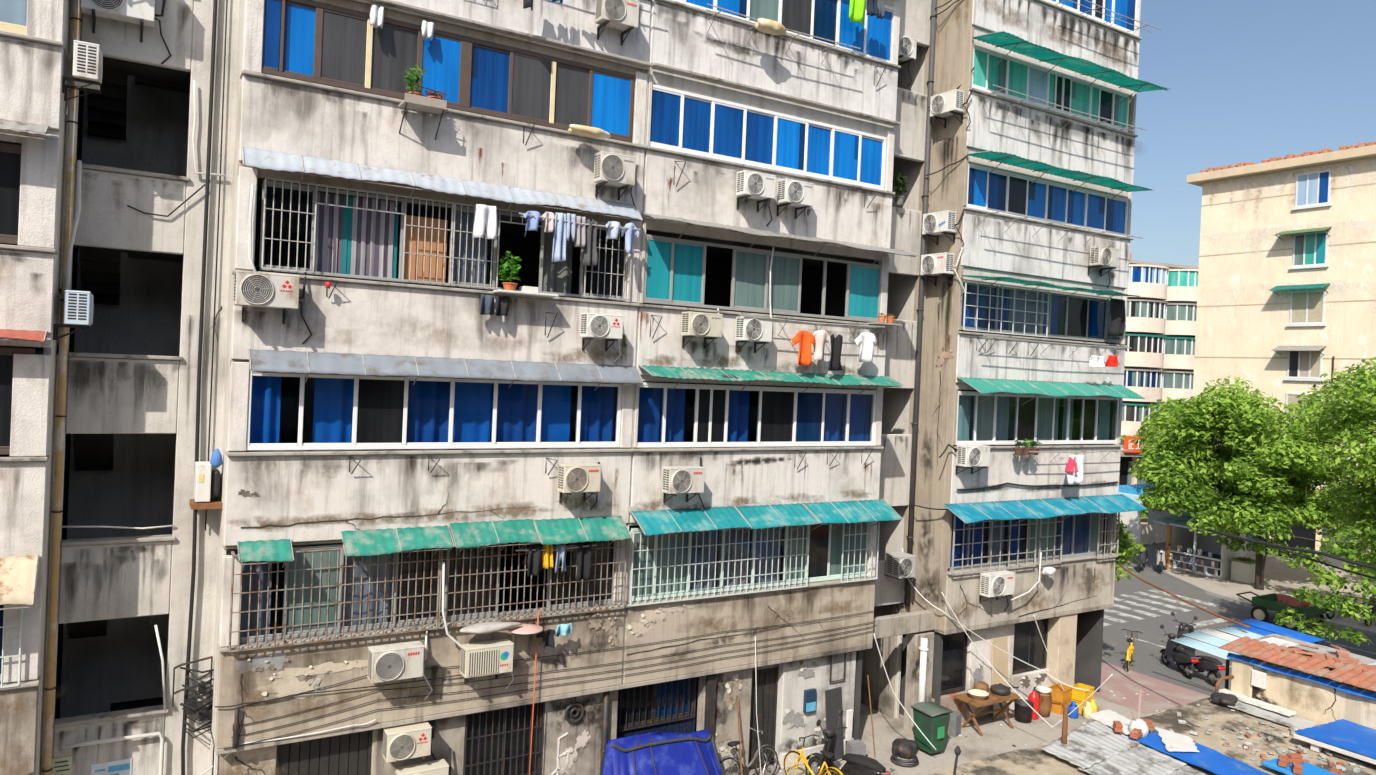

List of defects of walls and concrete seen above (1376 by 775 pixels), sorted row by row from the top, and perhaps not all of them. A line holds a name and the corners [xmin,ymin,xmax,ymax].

leakage [997,0,1136,62]
leakage [980,98,1131,150]
peeling [231,651,368,701]